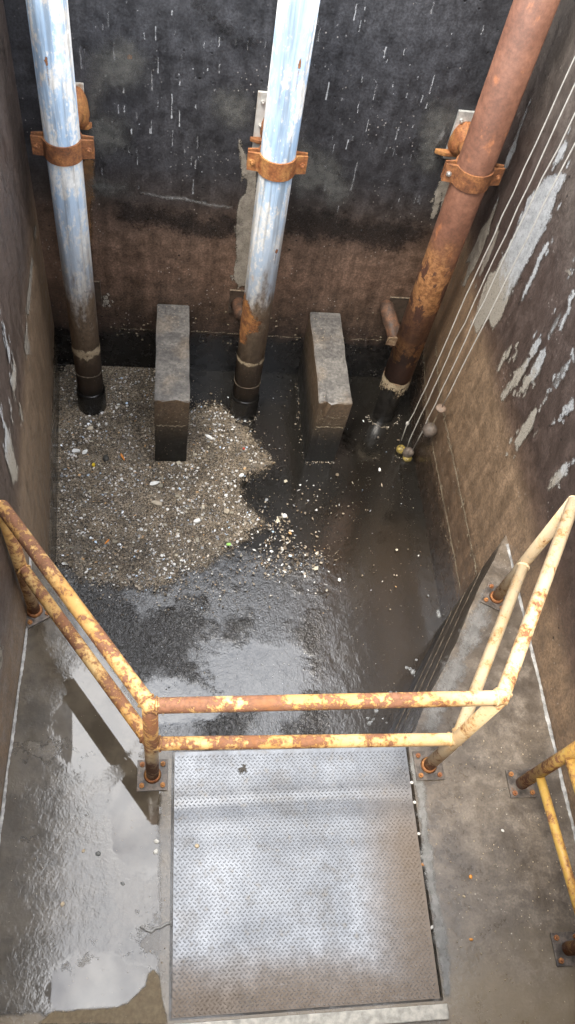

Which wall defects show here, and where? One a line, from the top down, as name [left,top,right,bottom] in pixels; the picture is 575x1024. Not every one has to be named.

water stain [118,202,236,239]
water stain [284,140,423,251]
peeling [460,128,571,336]
peeling [497,290,575,401]